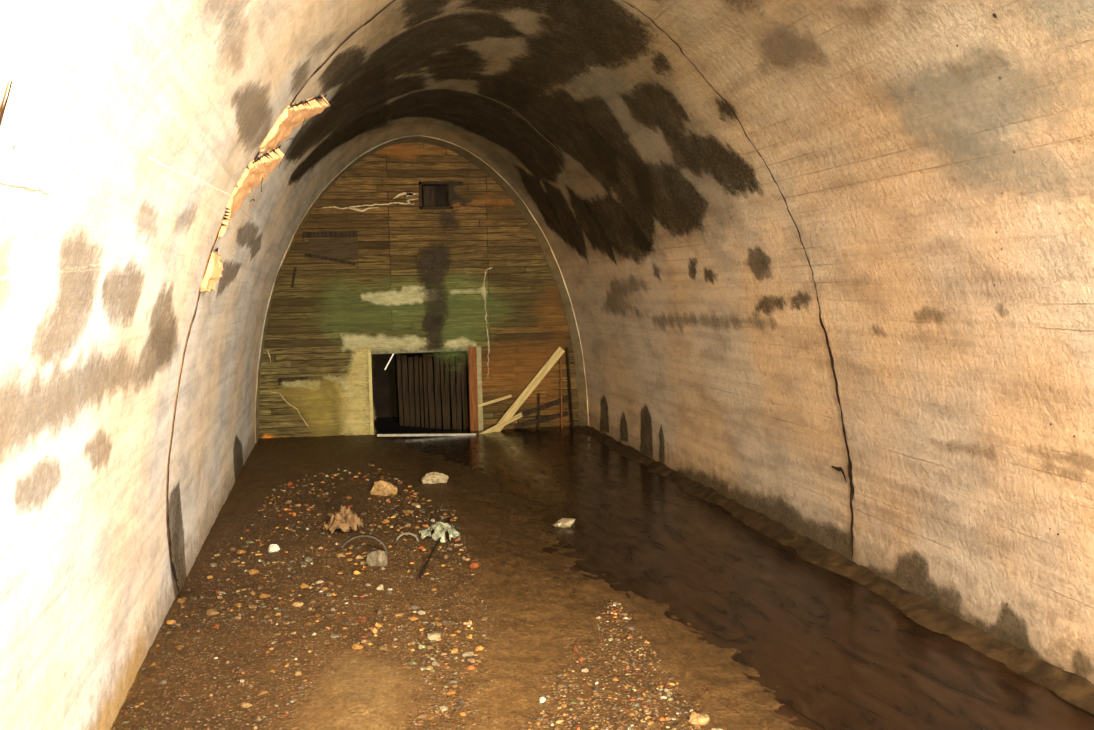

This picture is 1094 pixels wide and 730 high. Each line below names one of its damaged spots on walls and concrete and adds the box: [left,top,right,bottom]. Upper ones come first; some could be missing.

crack [0,80,12,126]
leakage [284,0,758,265]
crack [0,183,50,195]
leakage [0,233,177,458]
leakage [217,262,240,294]
leakage [237,222,262,258]
spalling [198,94,330,295]
leakage [284,245,475,435]
crack [621,0,854,557]
leakage [712,294,808,327]
leakage [600,396,665,464]
leakage [868,553,1046,662]